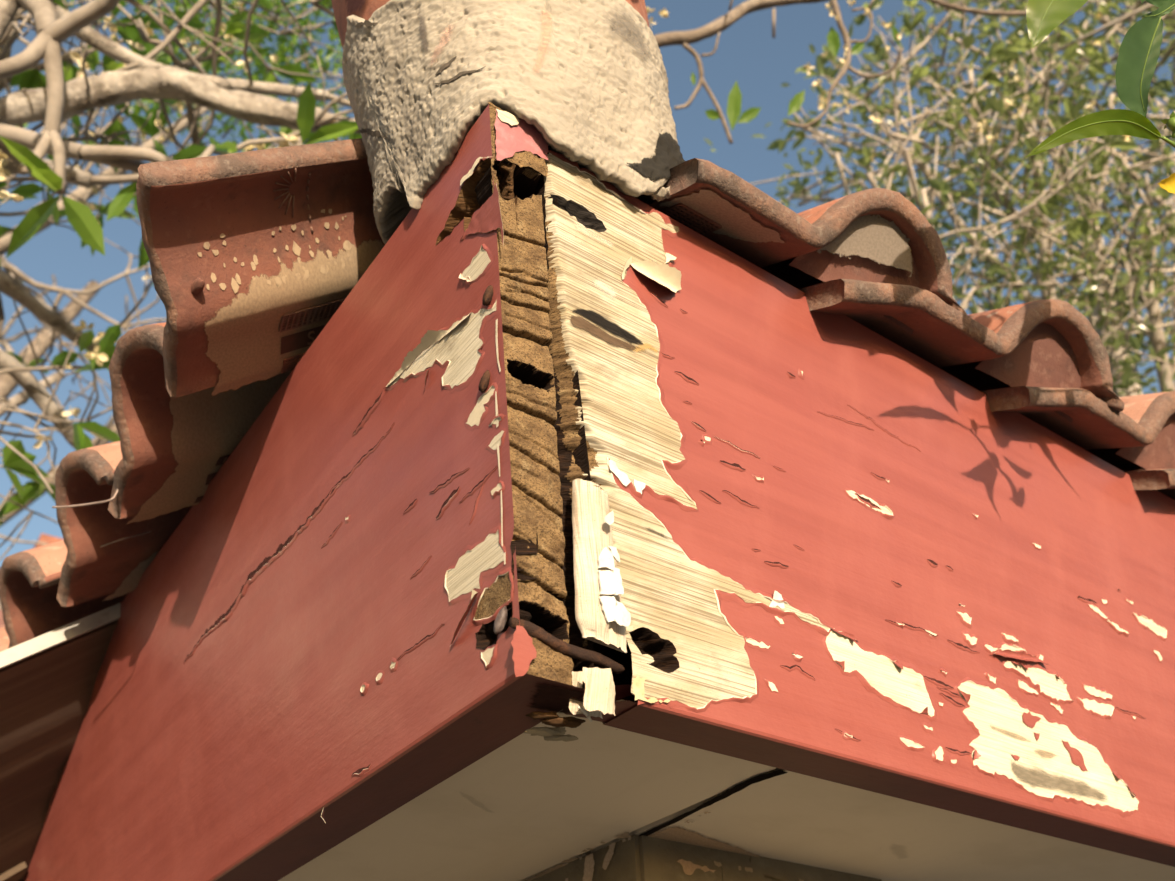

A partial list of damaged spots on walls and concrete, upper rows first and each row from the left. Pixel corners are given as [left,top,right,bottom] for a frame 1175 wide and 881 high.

peeling [460,156,494,186]
peeling [459,182,504,283]
peeling [386,297,499,394]
peeling [464,382,506,454]
crack [183,387,395,665]
crack [403,466,498,525]
peeling [534,150,1140,818]
crack [410,556,432,579]
peeling [444,523,514,646]
crack [397,624,444,660]
peeling [480,644,498,671]
peeling [1087,597,1167,663]